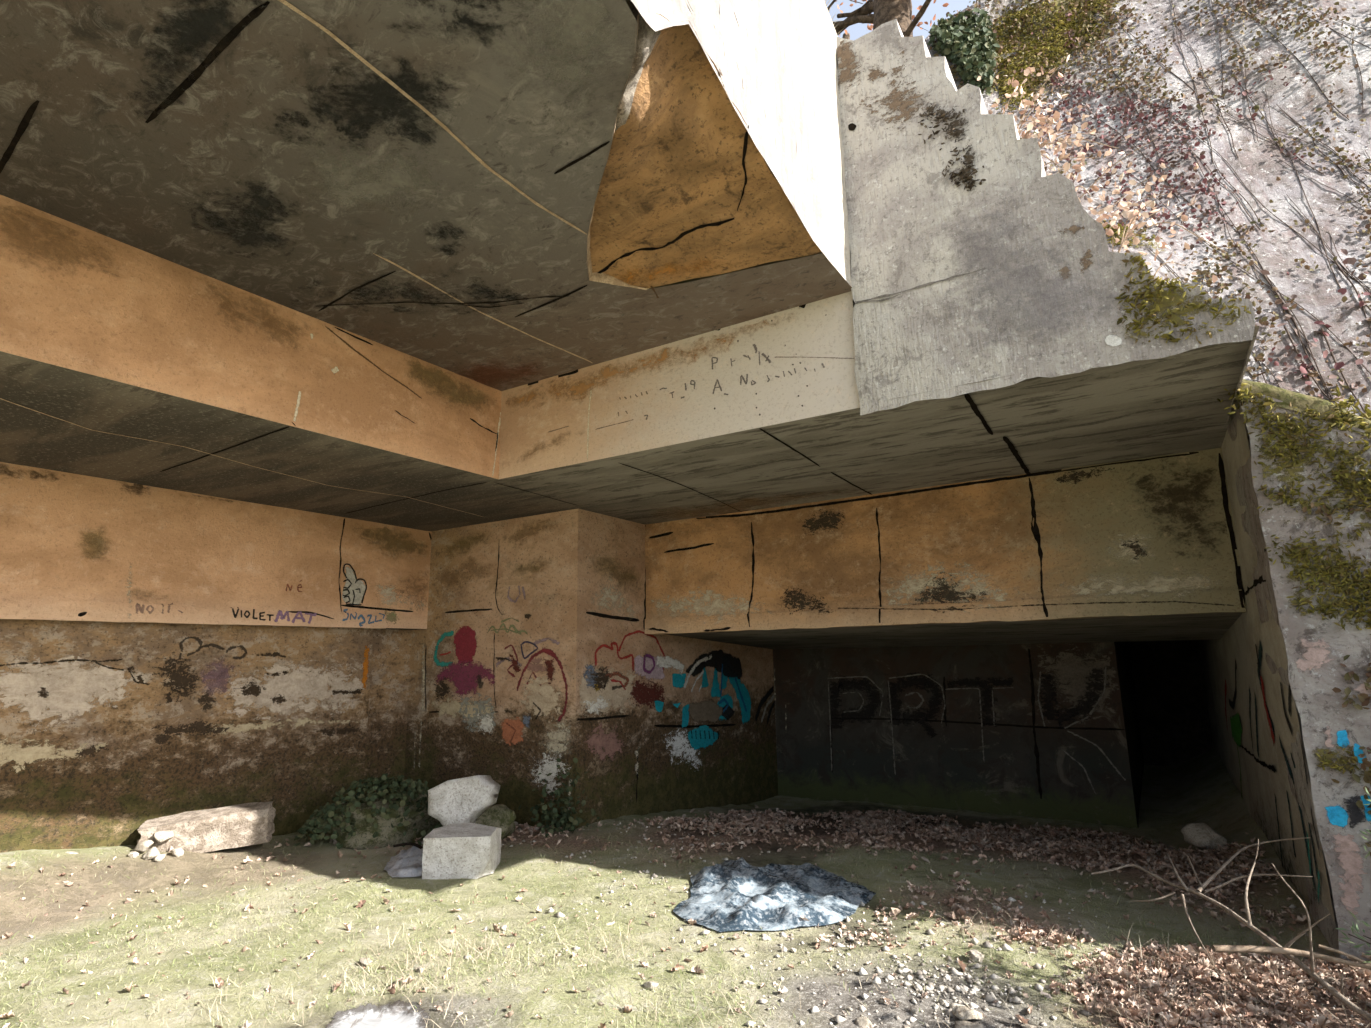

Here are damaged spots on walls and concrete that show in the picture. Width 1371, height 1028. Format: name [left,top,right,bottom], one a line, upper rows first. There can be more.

leakage [189,182,295,255]
leakage [273,58,453,148]
crack [598,125,749,274]
spalling [586,8,822,290]
crack [321,296,566,424]
crack [528,369,578,386]
crack [643,569,668,632]
crack [704,522,755,632]
leakage [779,586,829,615]
leakage [887,562,1007,613]
crack [838,478,1266,623]
peeling [0,652,365,773]